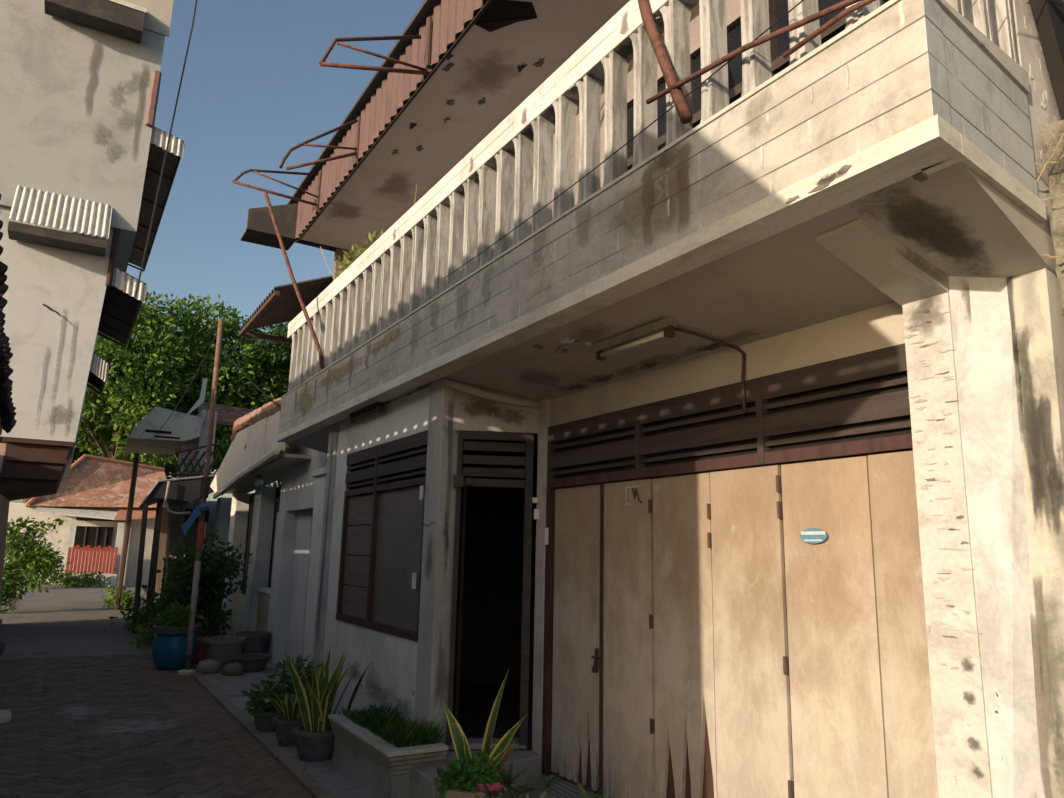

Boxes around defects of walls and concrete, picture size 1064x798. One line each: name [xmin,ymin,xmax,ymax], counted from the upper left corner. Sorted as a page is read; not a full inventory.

water stain [85,43,101,111]
water stain [111,70,148,150]
spalling [785,165,852,204]
water stain [1006,276,1064,528]
water stain [1031,582,1064,798]